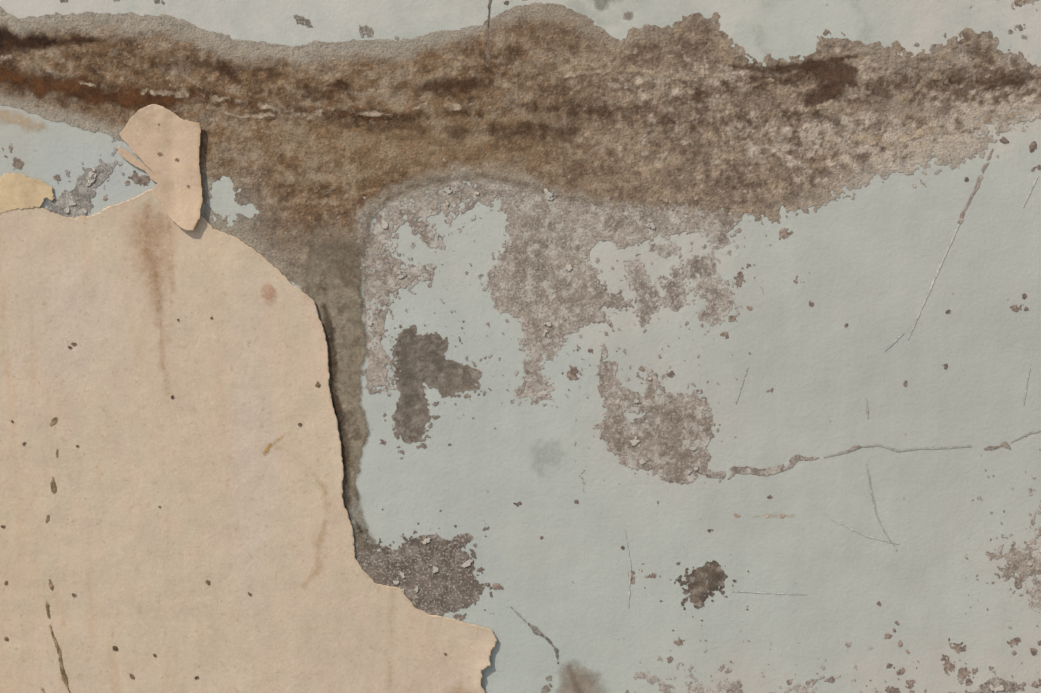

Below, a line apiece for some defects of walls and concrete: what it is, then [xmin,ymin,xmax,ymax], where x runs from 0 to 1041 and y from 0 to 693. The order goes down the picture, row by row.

water stain [0,0,1041,550]
peeling [350,159,793,484]
crack [907,149,994,340]
peeling [0,104,503,693]
peeling [628,554,736,626]
peeling [634,630,743,693]
peeling [770,621,926,693]
crack [705,430,1041,551]
peeling [940,638,1041,693]
peeling [965,471,1041,611]
peeling [1005,609,1041,664]